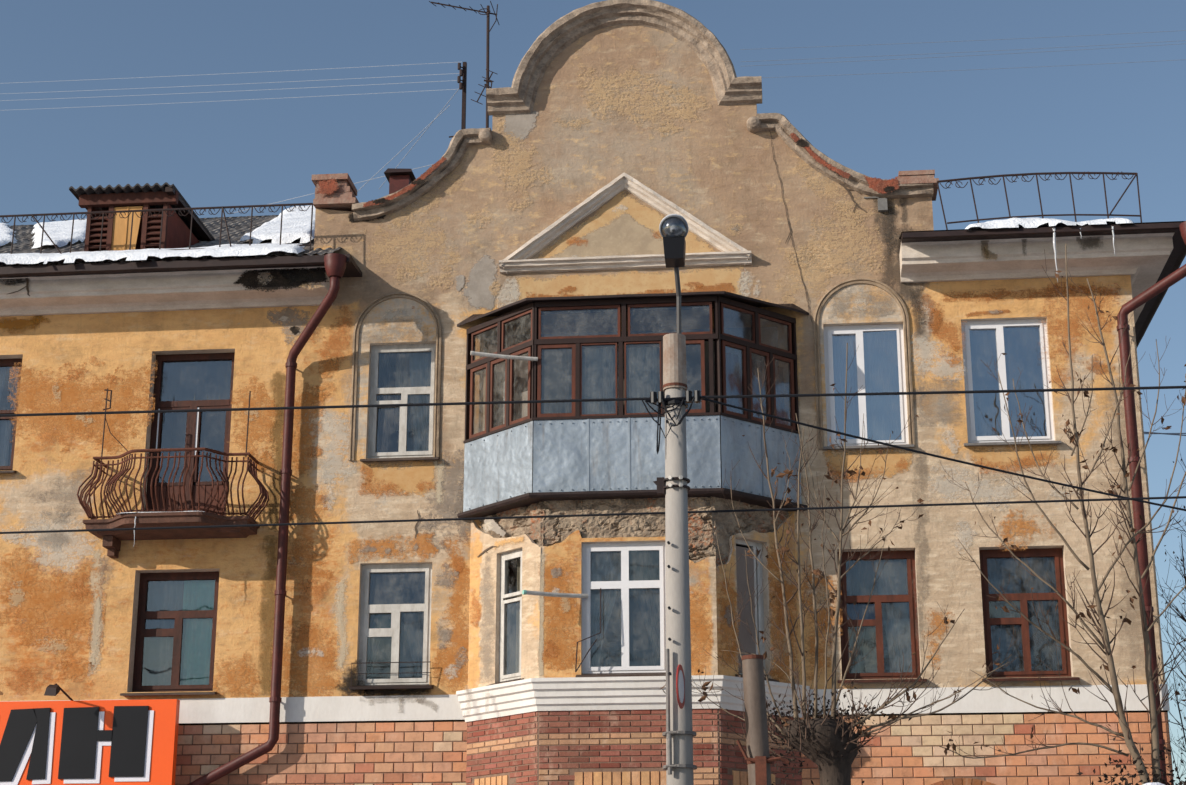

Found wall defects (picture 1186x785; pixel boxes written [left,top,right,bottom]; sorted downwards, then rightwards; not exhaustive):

crack [769,130,812,321]
damp [260,373,286,695]
spalling [348,479,665,691]